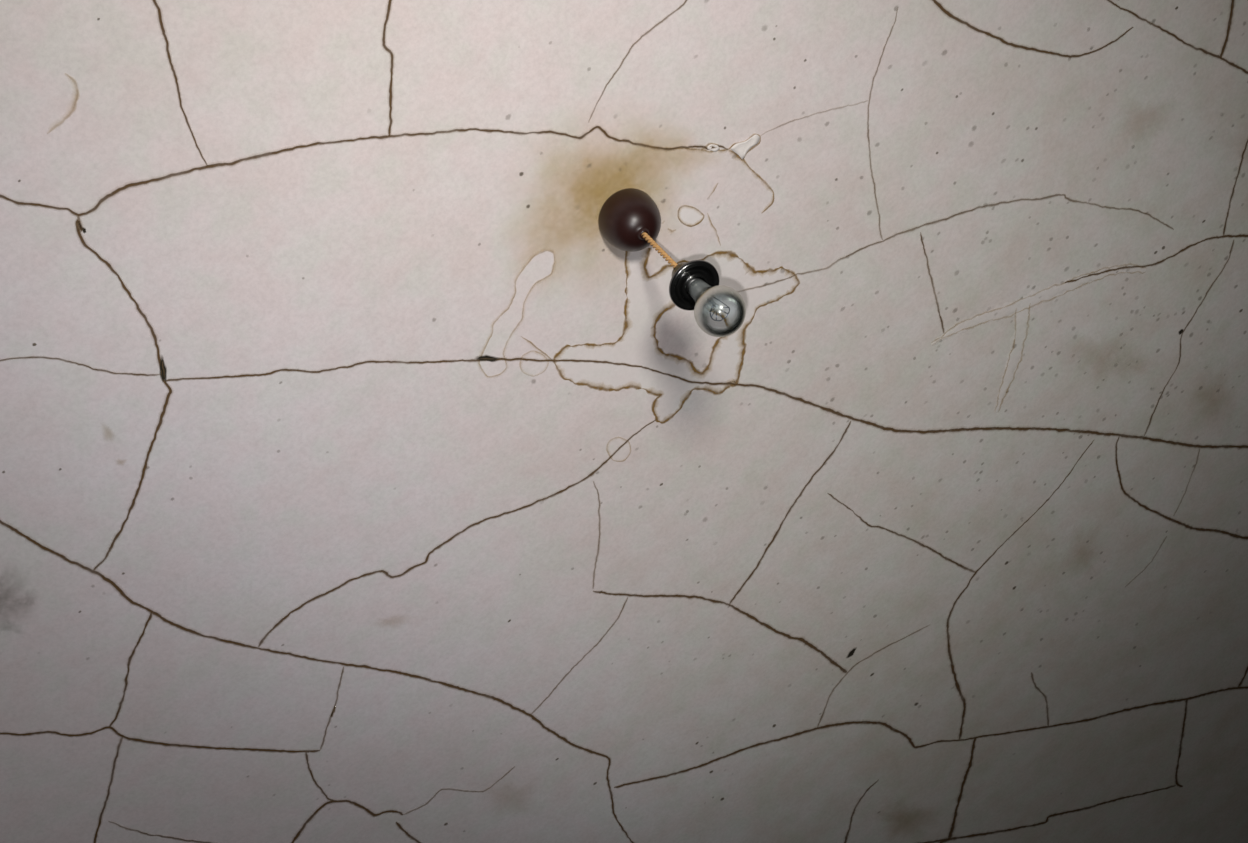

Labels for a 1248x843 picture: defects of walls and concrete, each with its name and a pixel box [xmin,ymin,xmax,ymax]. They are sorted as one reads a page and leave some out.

crack [0,0,727,376]
crack [0,359,1248,843]
crack [495,140,1248,673]
crack [933,0,1248,74]